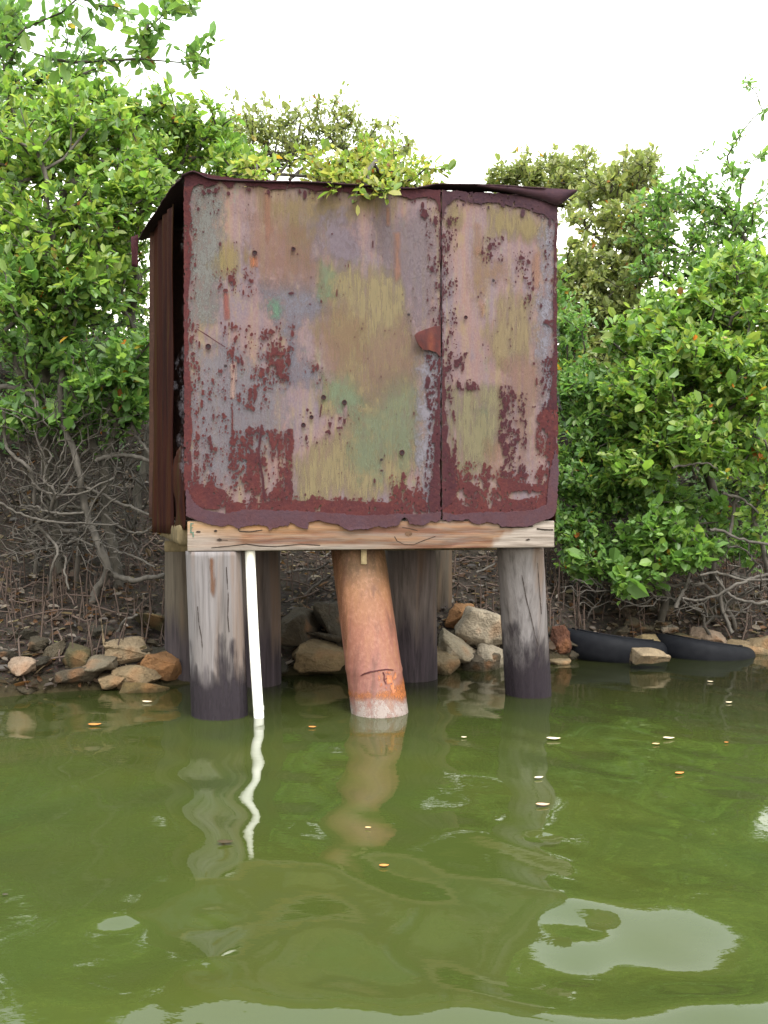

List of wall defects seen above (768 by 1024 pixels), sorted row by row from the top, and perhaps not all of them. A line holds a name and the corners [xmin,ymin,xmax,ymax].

corrosion [183,170,558,516]
peeling [184,322,559,531]
corrosion [348,679,407,702]